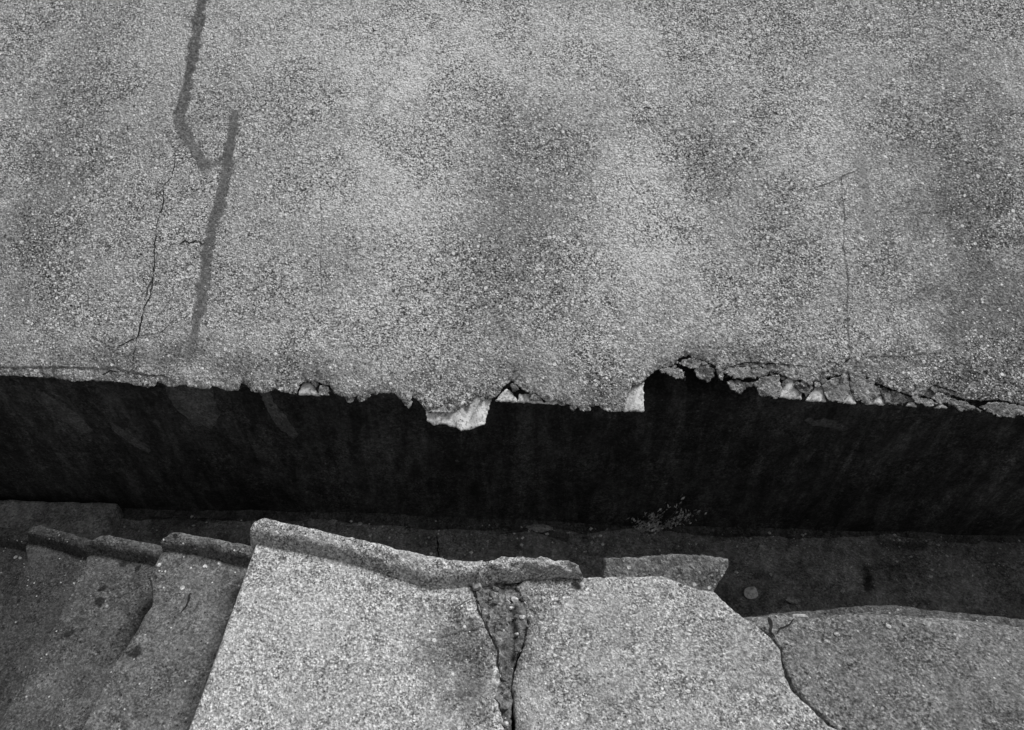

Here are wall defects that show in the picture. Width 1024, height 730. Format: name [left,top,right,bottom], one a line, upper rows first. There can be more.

leakage [174,0,239,328]
crack [0,147,202,380]
peeling [165,385,221,429]
peeling [259,392,298,439]
spalling [299,381,330,396]
spalling [426,383,591,431]
spalling [623,382,644,412]
spalling [659,355,1024,420]
crack [768,617,794,637]